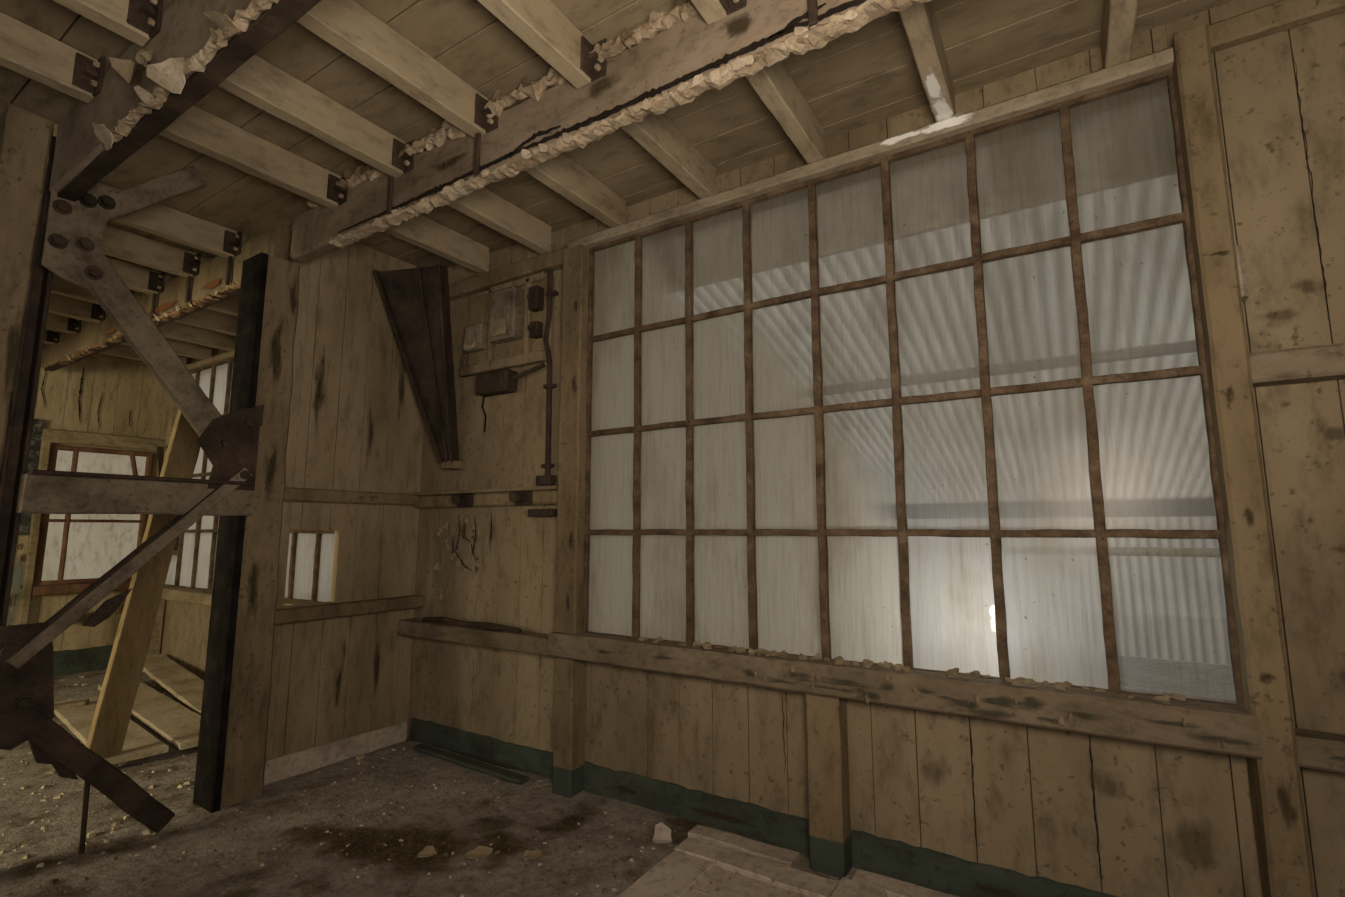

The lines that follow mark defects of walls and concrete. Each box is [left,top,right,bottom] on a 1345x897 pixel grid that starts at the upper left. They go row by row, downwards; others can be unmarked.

peeling [91,0,279,151]
crack [338,0,867,233]